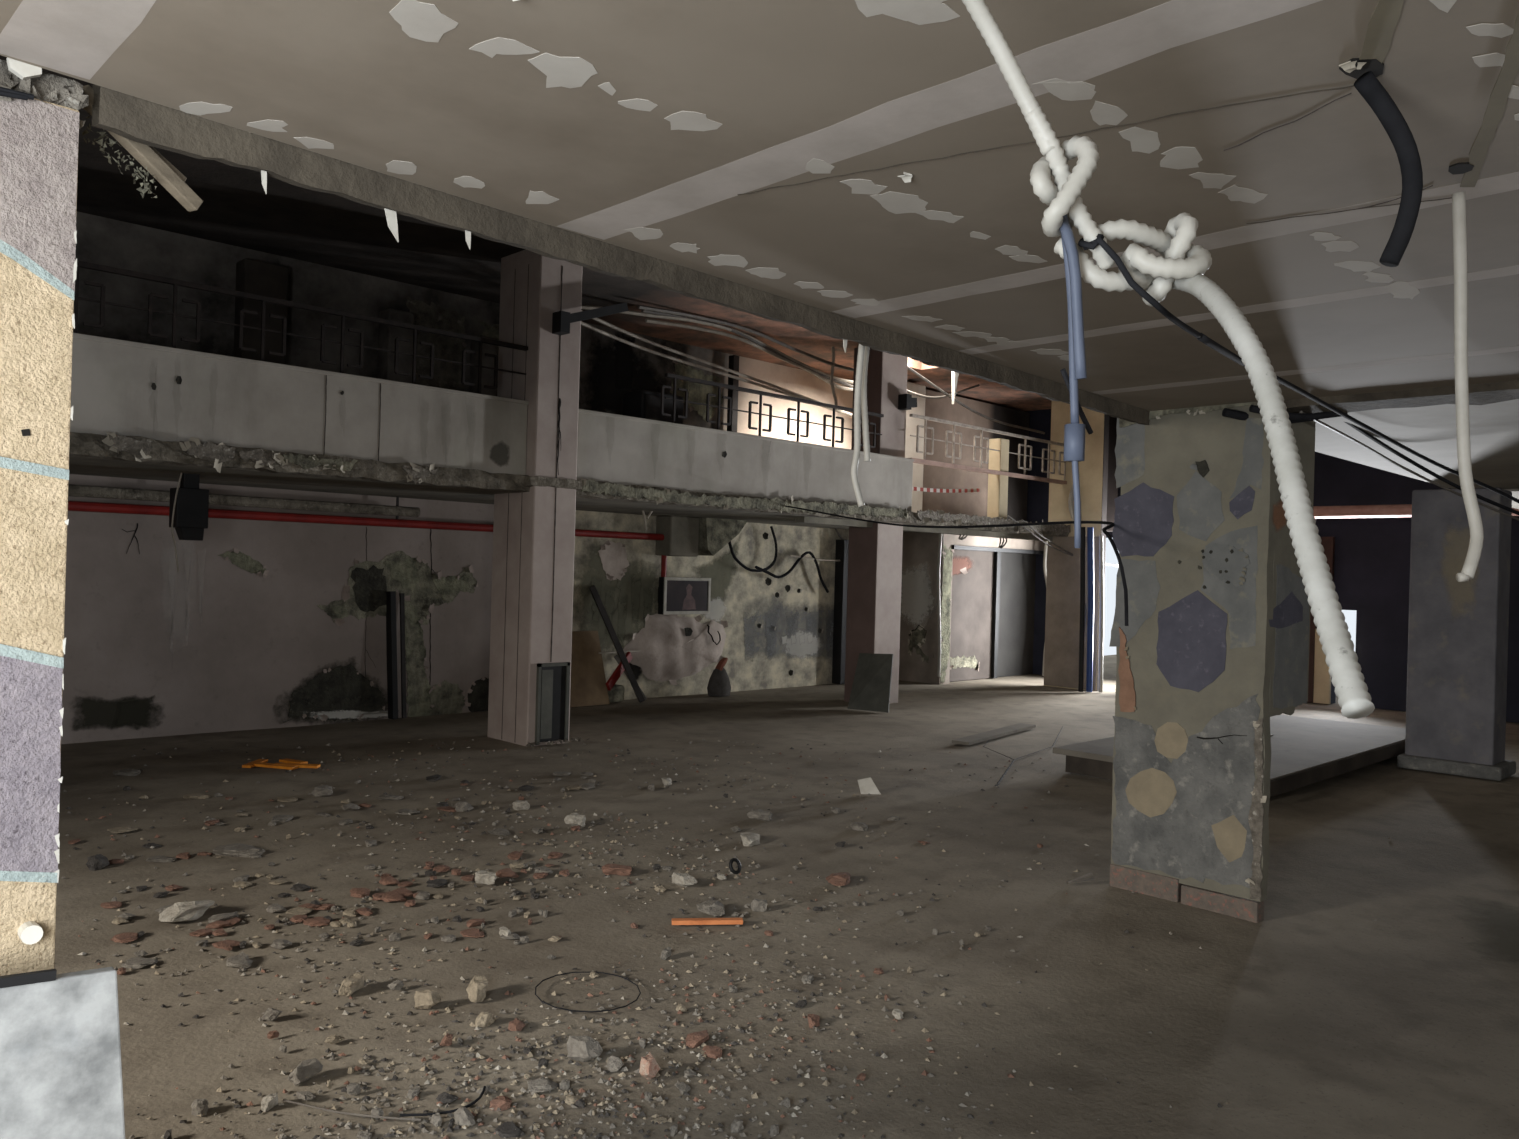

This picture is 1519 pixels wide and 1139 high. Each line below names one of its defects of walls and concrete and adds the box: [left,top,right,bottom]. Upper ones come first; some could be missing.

spalling [102,431,152,462]
spalling [179,437,284,473]
spalling [1190,460,1209,478]
peeling [274,661,388,724]
peeling [317,551,489,717]
leakage [574,546,658,649]
leakage [696,544,738,621]
leakage [744,599,834,658]
spalling [1118,627,1136,712]
spalling [1245,718,1267,901]